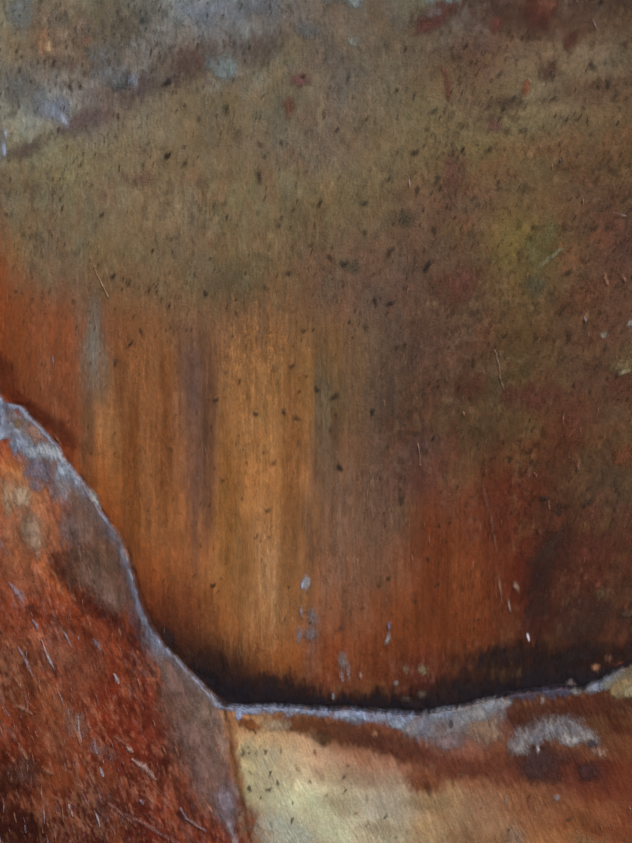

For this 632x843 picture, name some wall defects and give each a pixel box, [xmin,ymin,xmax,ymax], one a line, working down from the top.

crack [9,403,110,523]
water stain [0,356,632,825]
crack [129,551,632,718]
rust [224,717,268,843]
rust [278,714,513,796]